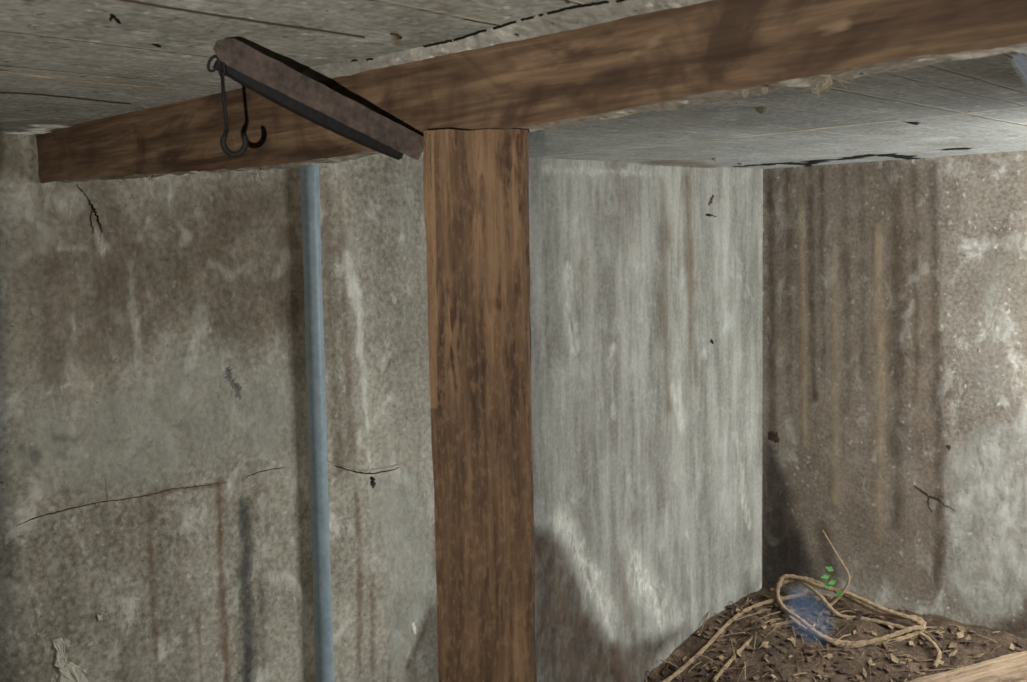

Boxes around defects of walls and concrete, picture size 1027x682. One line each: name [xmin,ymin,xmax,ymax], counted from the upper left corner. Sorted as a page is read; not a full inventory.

crack [733,153,920,168]
crack [17,467,284,526]
leakage [763,449,809,588]
leakage [244,620,252,682]